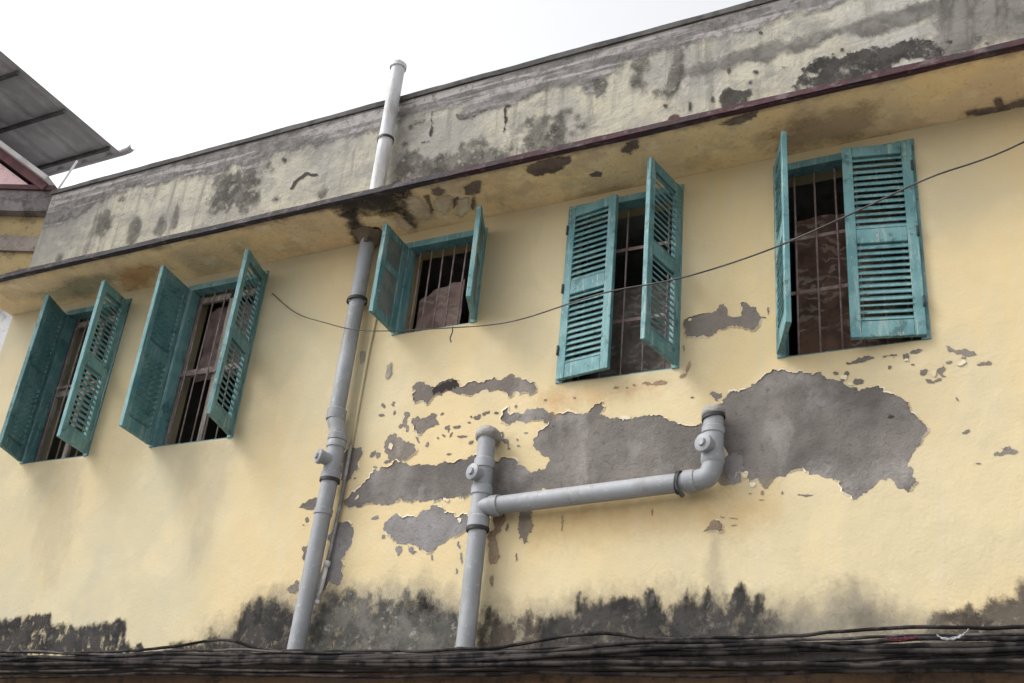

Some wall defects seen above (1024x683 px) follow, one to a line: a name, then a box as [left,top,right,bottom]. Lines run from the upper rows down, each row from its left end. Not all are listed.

water stain [629,0,1024,108]
flaking render [966,99,1024,116]
crack [283,158,318,189]
water stain [318,109,584,244]
flaking render [526,156,571,176]
flaking render [679,301,769,378]
flaking render [710,346,992,501]
flaking render [316,374,703,600]
water stain [0,613,143,655]
water stain [305,589,459,650]
water stain [476,582,799,649]
water stain [921,583,1024,643]